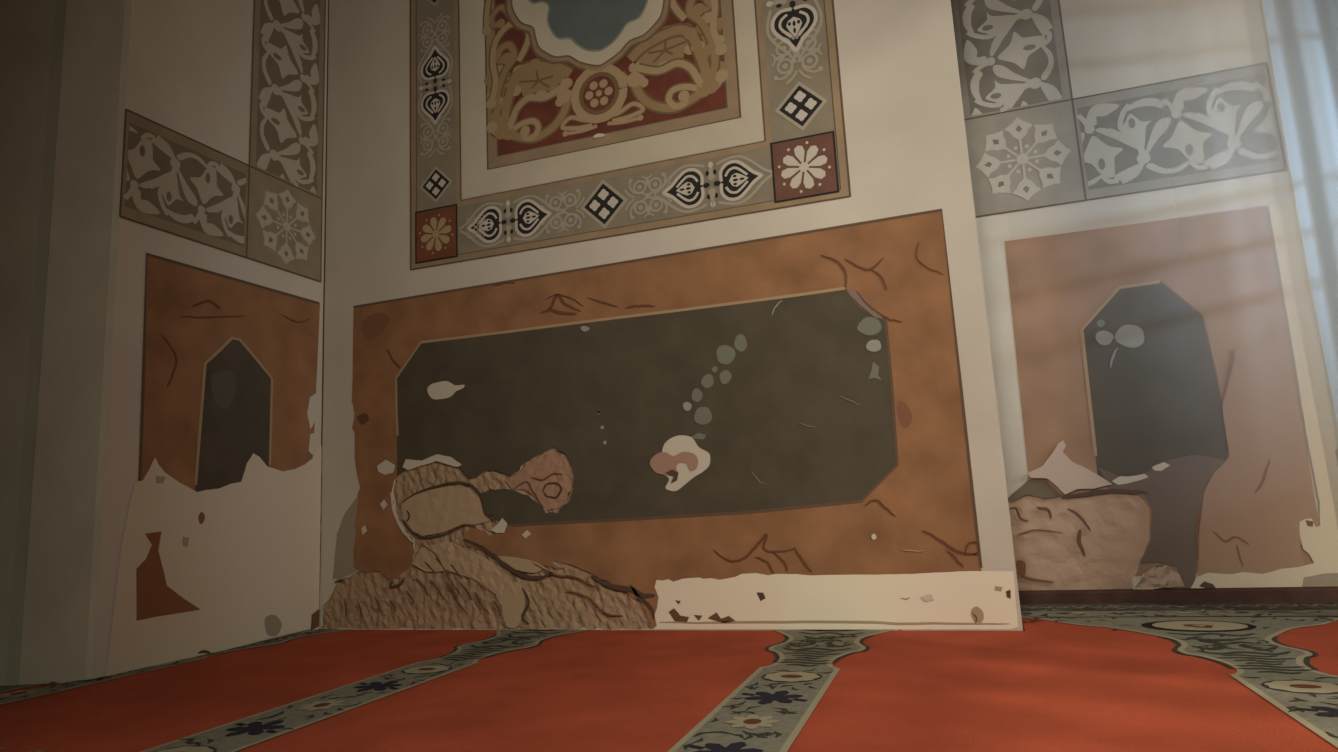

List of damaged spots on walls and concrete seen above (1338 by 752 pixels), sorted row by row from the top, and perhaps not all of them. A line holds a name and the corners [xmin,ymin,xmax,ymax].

crack [821,255,902,322]
crack [916,243,944,275]
peeling [106,205,1338,676]